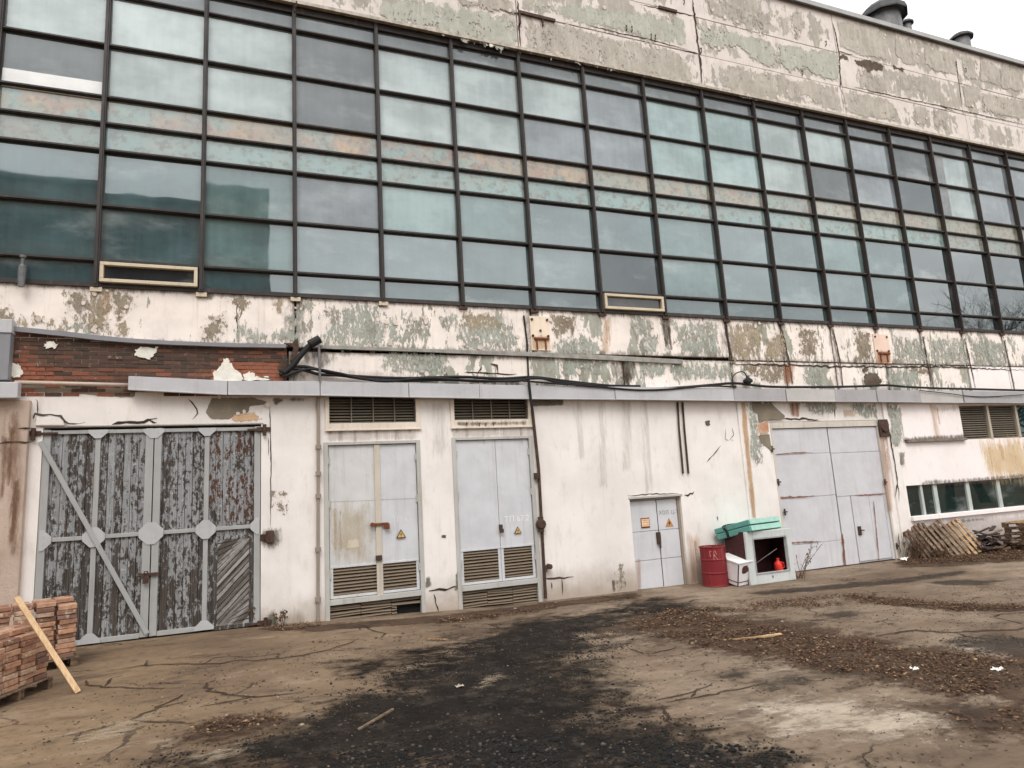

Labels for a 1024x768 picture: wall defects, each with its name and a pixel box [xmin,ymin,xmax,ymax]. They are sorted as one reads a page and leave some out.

flaking render [0,286,304,397]